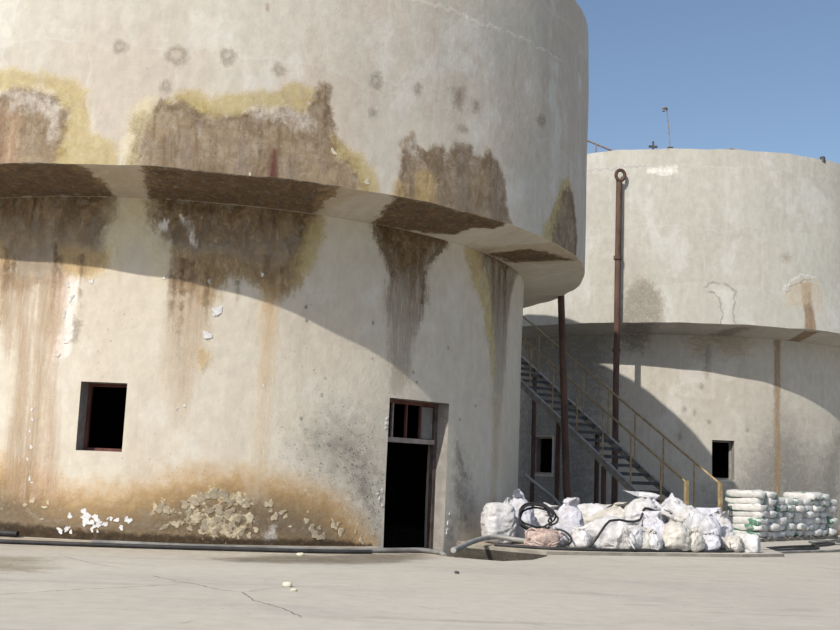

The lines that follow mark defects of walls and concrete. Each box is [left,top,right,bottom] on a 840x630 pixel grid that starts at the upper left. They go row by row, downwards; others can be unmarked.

water stain [0,70,422,564]
water stain [372,133,512,314]
water stain [466,179,577,375]
water stain [621,279,663,349]
corrosion [774,279,816,494]
peeling [150,486,259,539]
peeling [265,499,292,528]
peeling [304,510,344,540]